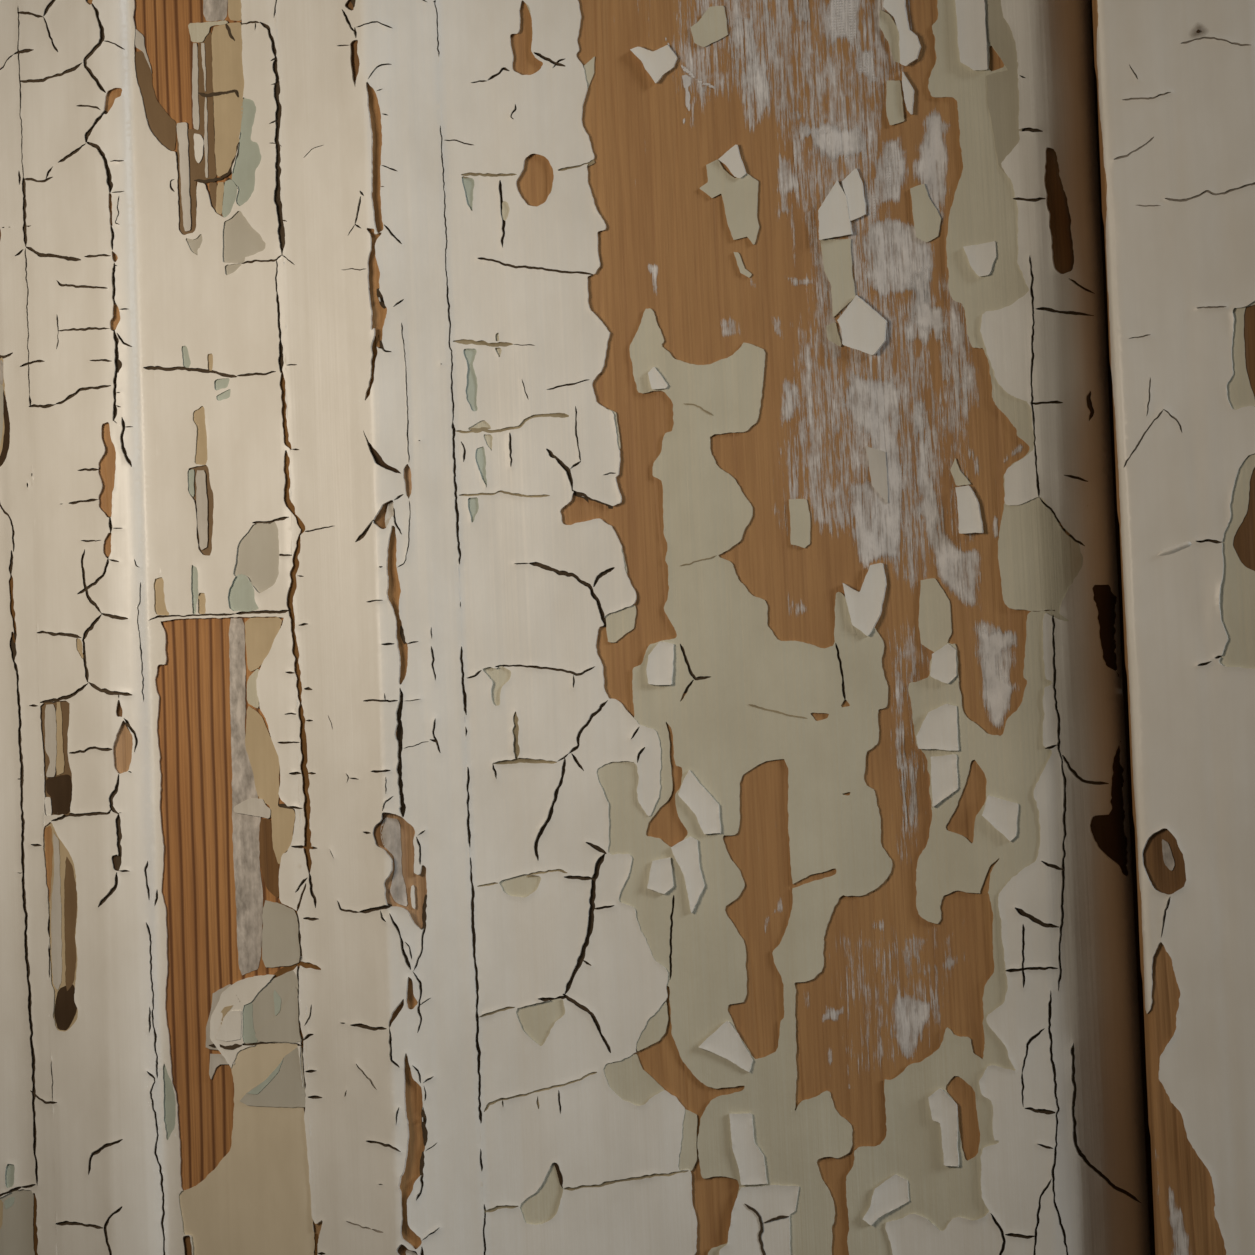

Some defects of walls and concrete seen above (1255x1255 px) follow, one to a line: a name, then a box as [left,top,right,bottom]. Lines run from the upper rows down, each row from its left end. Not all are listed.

peeling [133,0,266,275]
crack [440,129,615,563]
peeling [41,701,78,1032]
crack [0,0,436,1255]
peeling [154,406,323,1255]
peeling [374,813,427,930]
crack [348,626,594,864]
crack [467,701,614,1170]
crack [515,562,615,627]
peeling [561,0,1083,1255]
crack [992,615,1141,1255]
peeling [1090,384,1226,1255]